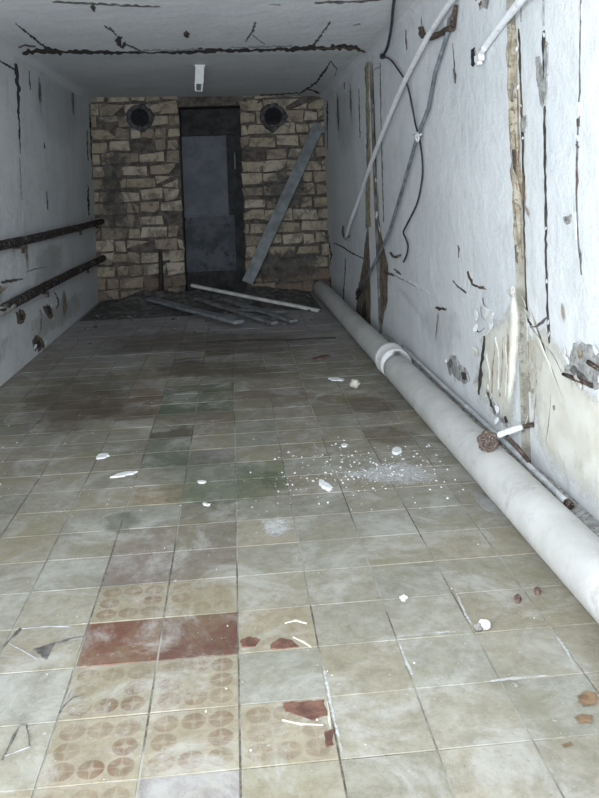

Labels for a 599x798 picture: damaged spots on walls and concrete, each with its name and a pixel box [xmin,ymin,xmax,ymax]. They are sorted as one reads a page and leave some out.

peeling [445,285,599,497]